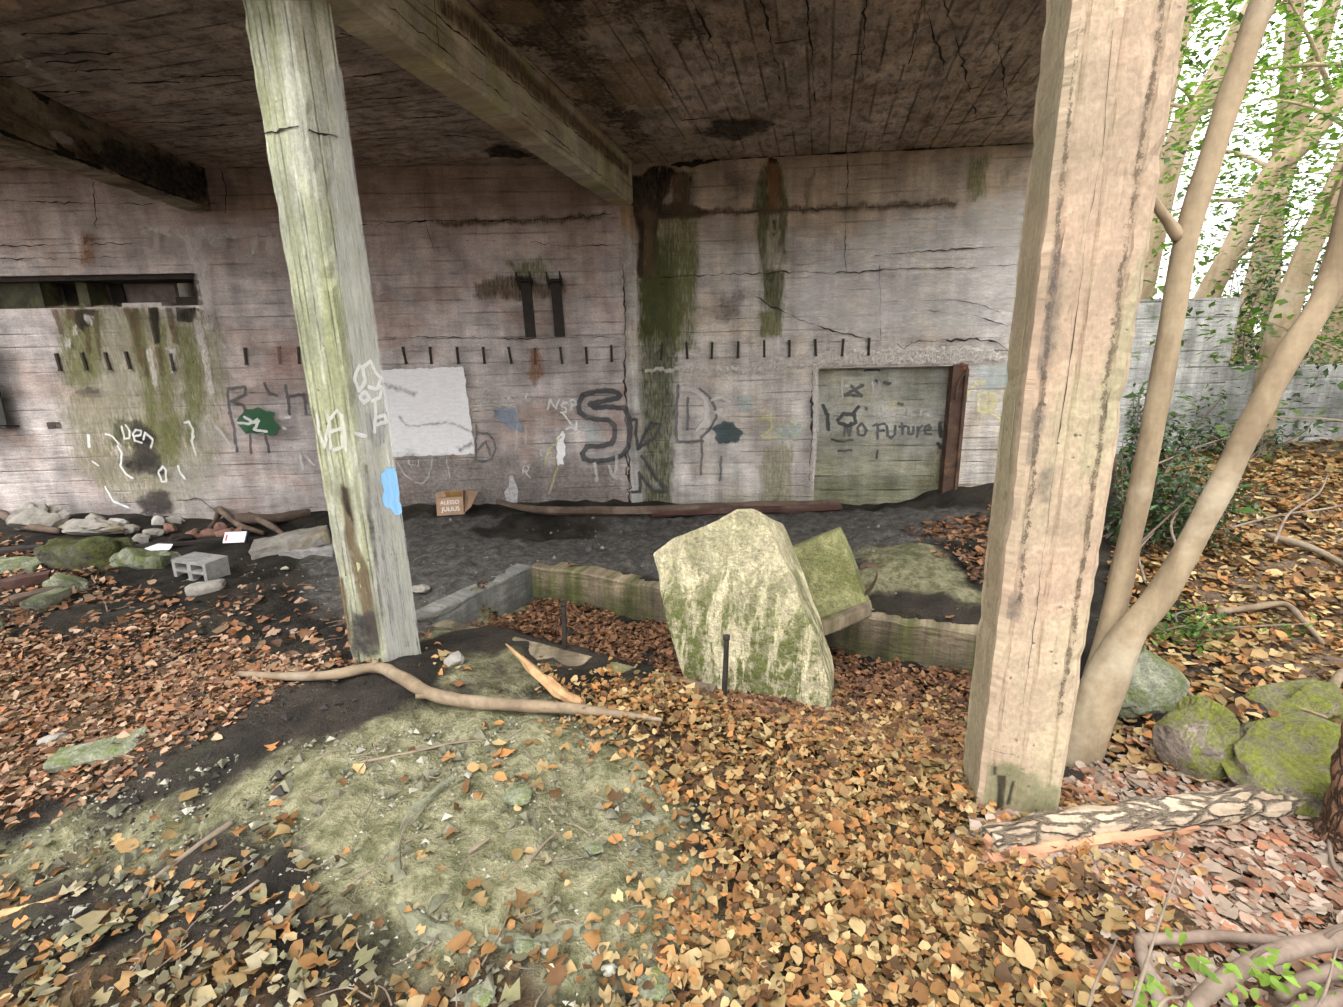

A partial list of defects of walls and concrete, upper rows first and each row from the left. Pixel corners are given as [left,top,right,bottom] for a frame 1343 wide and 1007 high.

crack [0,130,227,261]
crack [0,32,471,140]
water stain [440,0,710,503]
crack [361,0,1034,503]
water stain [702,119,775,141]
water stain [755,162,787,337]
water stain [52,307,224,507]